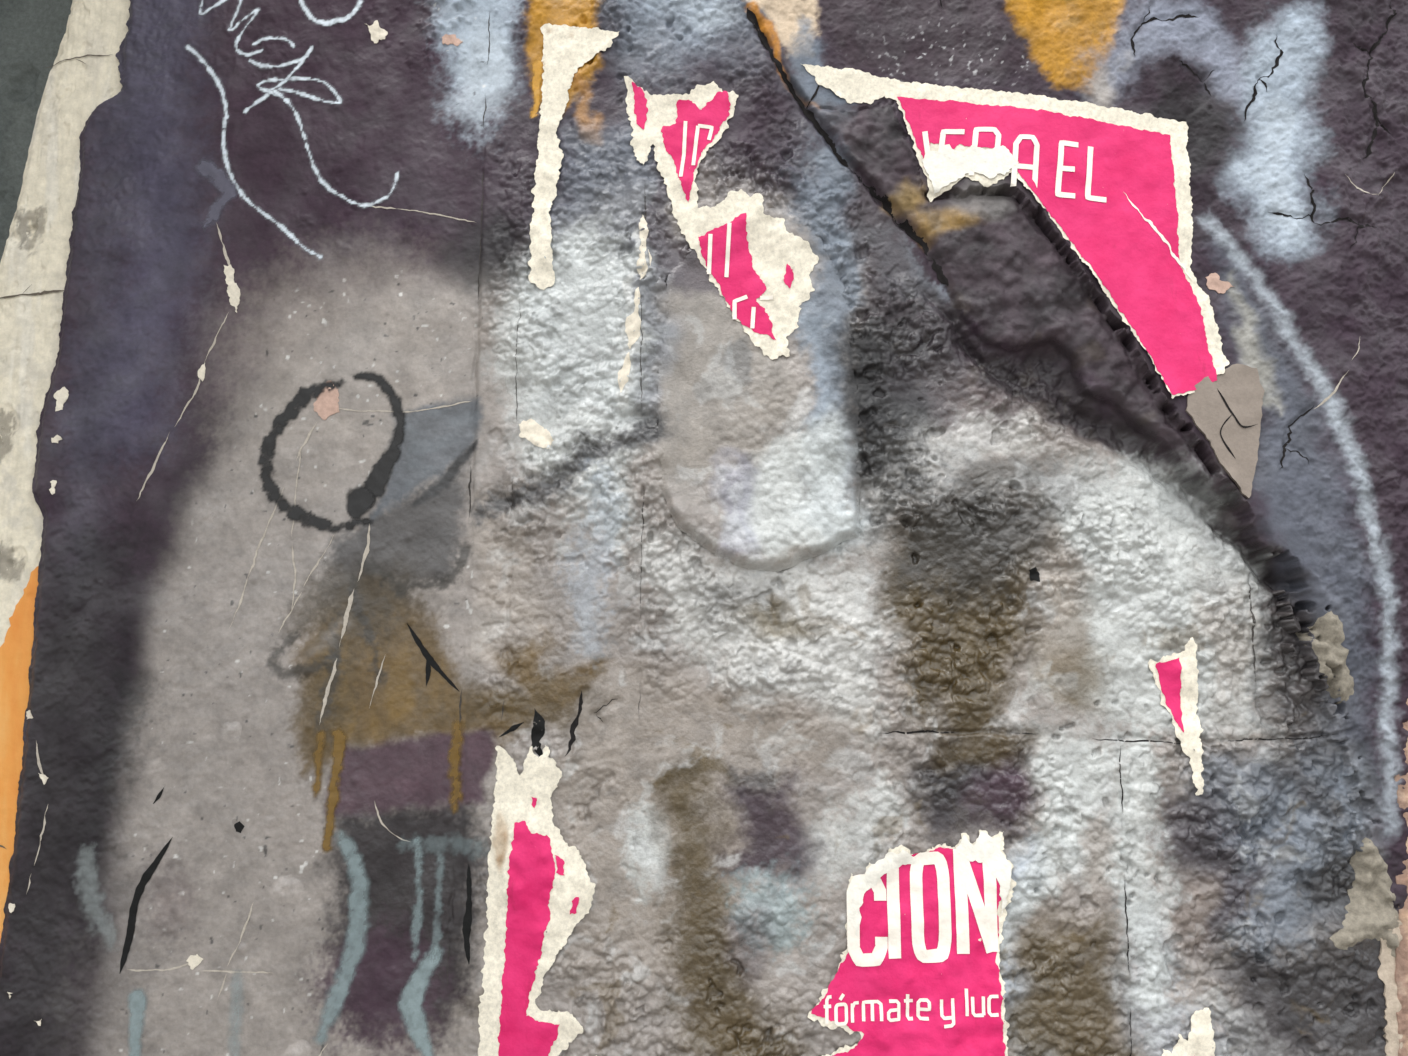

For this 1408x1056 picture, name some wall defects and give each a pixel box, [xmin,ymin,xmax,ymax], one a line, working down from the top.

crack [1131,6,1196,55]
crack [1181,61,1213,95]
crack [1245,38,1283,120]
crack [747,8,949,286]
peeling [618,287,641,392]
flaking render [810,105,1265,507]
crack [1248,582,1256,677]
peeling [0,566,48,941]
peeling [187,954,203,970]